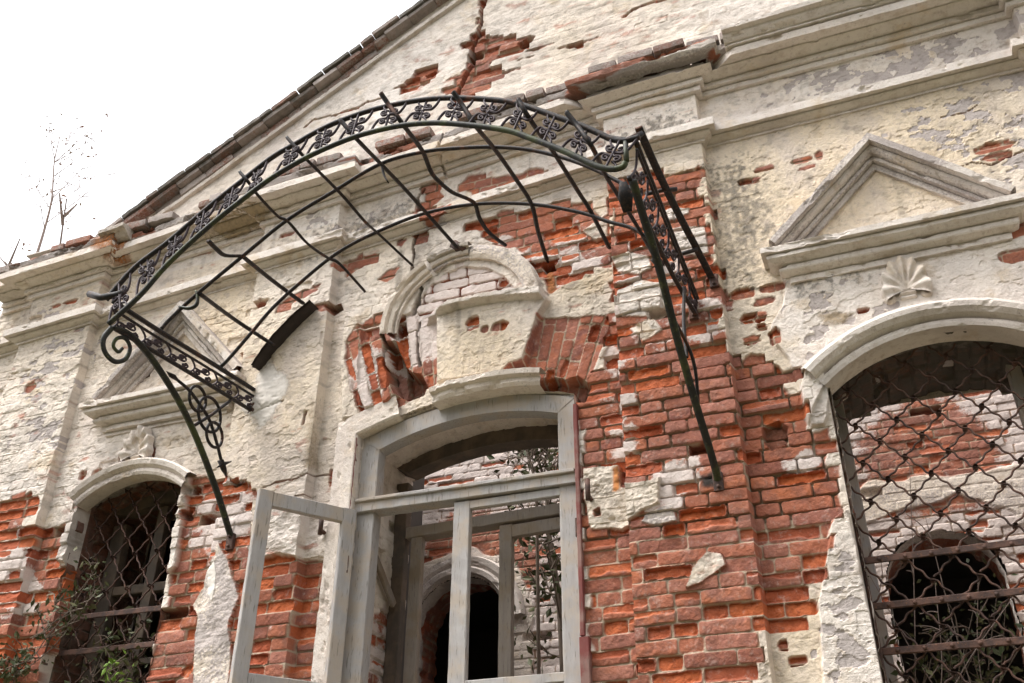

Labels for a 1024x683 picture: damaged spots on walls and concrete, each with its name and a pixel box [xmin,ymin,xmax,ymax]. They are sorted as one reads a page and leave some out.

crack [454,0,488,107]
spalling [238,38,726,196]
spalling [396,0,596,102]
peeling [783,32,990,94]
peeling [901,86,1024,185]
spalling [4,203,223,272]
spalling [329,252,400,282]
spalling [344,266,513,412]
spalling [458,158,900,683]
spalling [0,487,91,683]
spalling [146,472,257,683]
spalling [249,509,328,681]